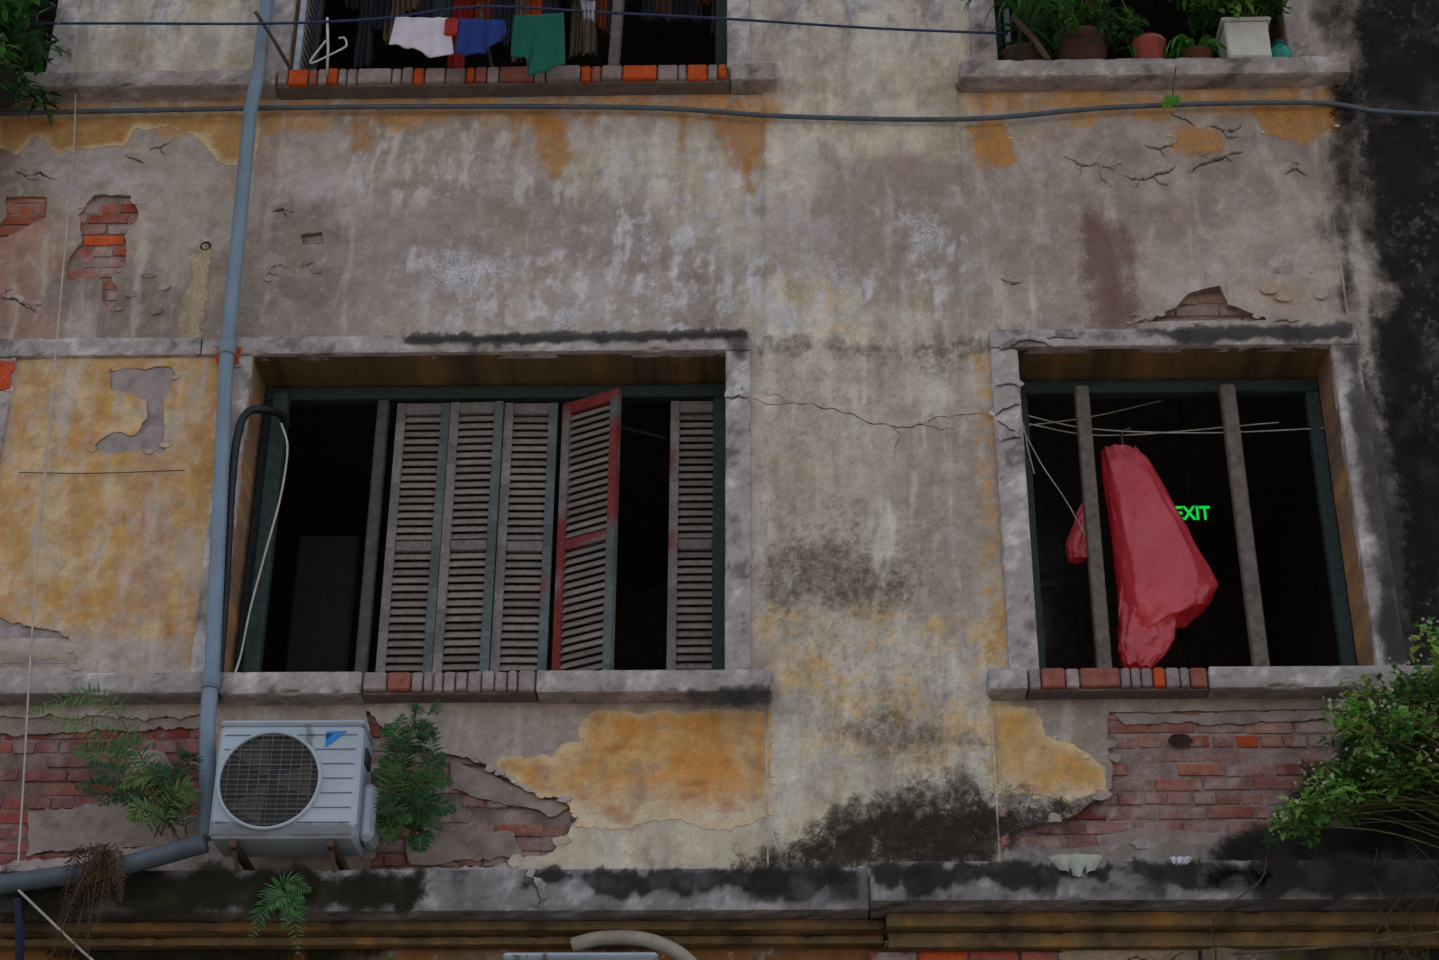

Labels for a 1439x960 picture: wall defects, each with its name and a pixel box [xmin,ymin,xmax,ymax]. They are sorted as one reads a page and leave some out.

spalling [67,196,142,312]
spalling [1153,291,1264,325]
water stain [1086,0,1439,666]
spalling [86,367,181,455]
water stain [768,548,905,605]
water stain [684,685,771,707]
spalling [0,710,208,866]
peeling [361,708,775,870]
water stain [520,696,1439,909]
spalling [985,703,1362,849]
water stain [47,949,384,960]
spalling [866,922,1072,960]